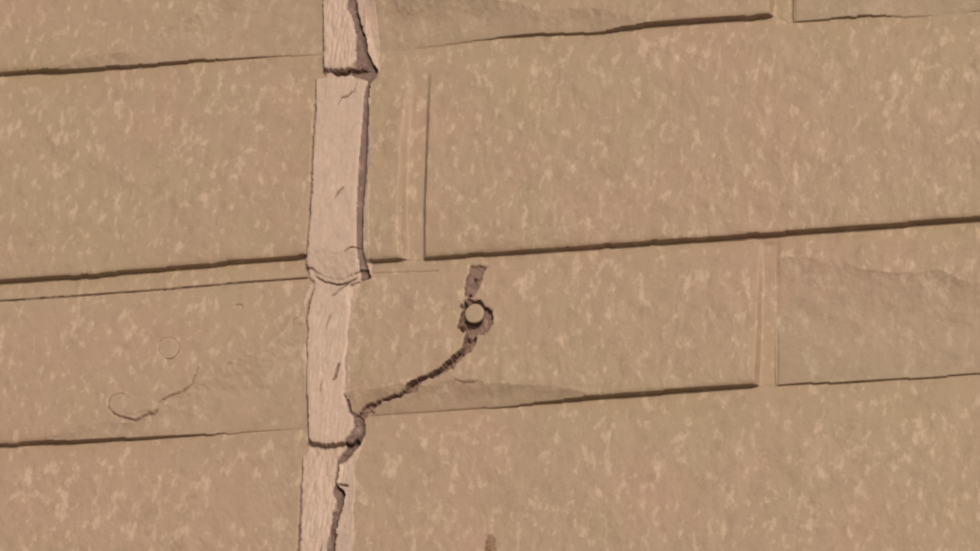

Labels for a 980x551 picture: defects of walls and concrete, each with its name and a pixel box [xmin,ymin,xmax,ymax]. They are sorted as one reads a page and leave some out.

crack [316,0,379,323]
crack [357,265,494,420]
crack [320,455,350,551]